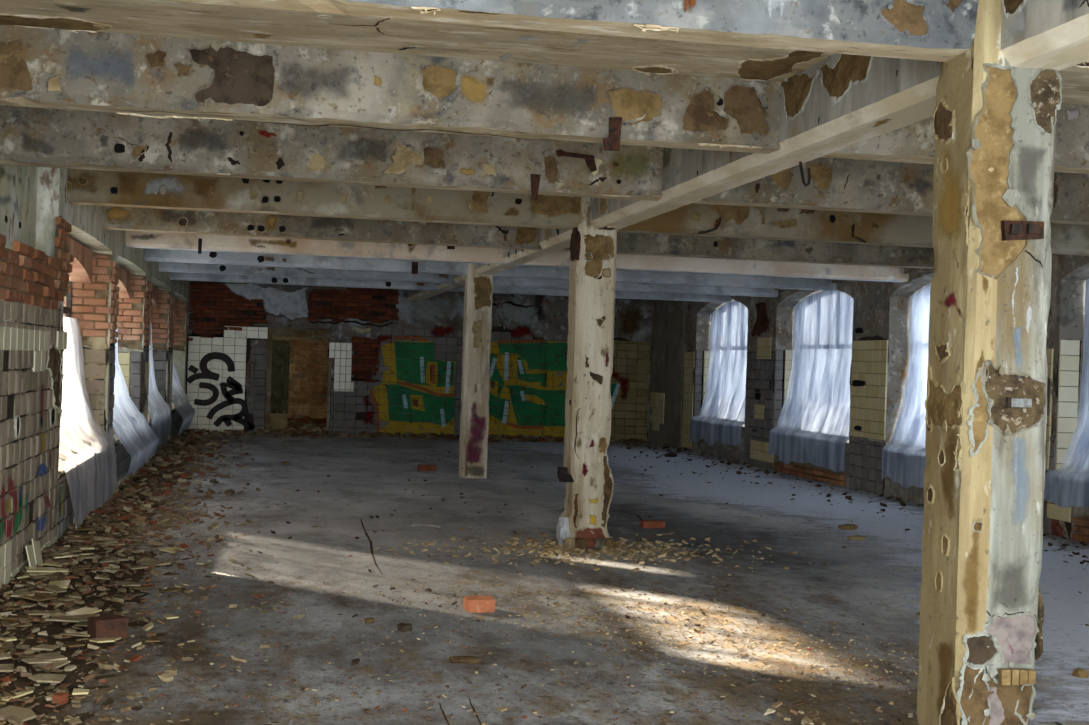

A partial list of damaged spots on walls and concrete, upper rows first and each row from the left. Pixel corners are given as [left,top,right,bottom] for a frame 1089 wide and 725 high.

spalling [879,0,930,39]
spalling [940,0,967,18]
spalling [116,39,277,136]
spalling [681,50,874,149]
spalling [933,98,956,145]
spalling [963,63,1081,280]
spalling [583,179,631,280]
flaking render [0,216,399,352]
flaking render [350,336,379,383]
spalling [925,341,1053,472]
spalling [939,612,1038,725]